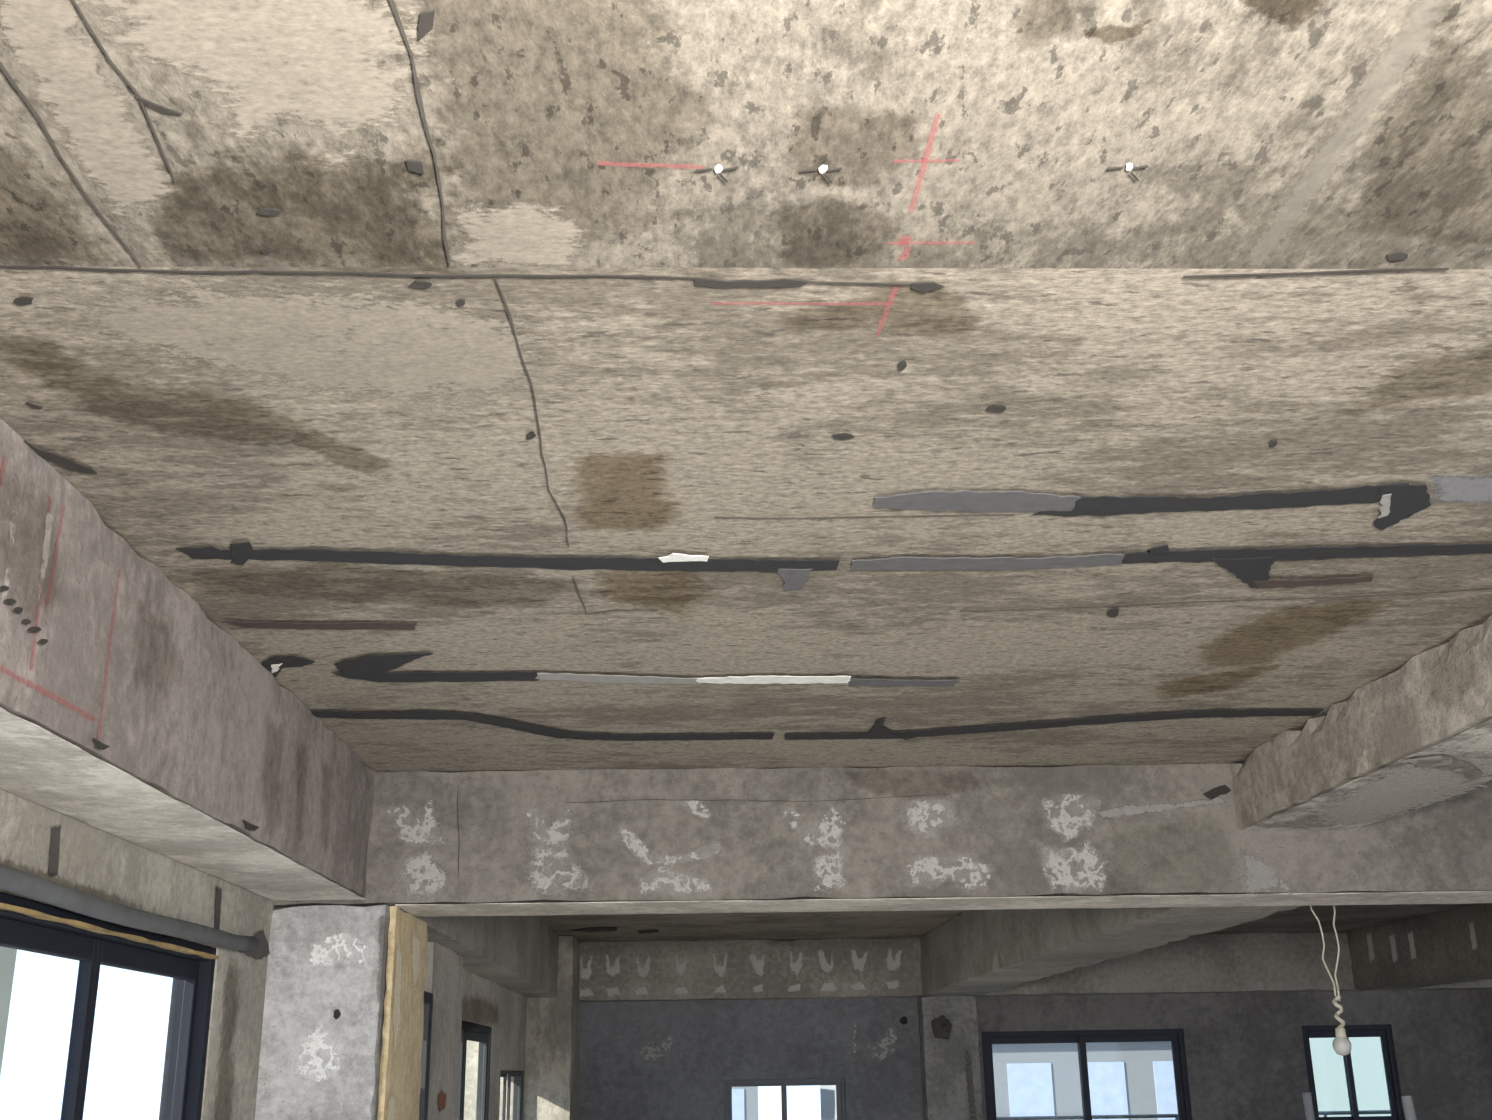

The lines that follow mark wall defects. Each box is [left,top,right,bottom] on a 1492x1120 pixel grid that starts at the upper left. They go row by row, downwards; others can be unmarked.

crack [0,0,1492,618]
efflorescence [387,800,446,894]
water stain [526,809,588,893]
efflorescence [621,829,719,893]
efflorescence [686,800,710,818]
efflorescence [784,807,846,890]
efflorescence [906,797,953,838]
efflorescence [908,856,990,889]
efflorescence [1042,794,1106,891]
water stain [309,933,368,967]
water stain [298,1024,340,1082]